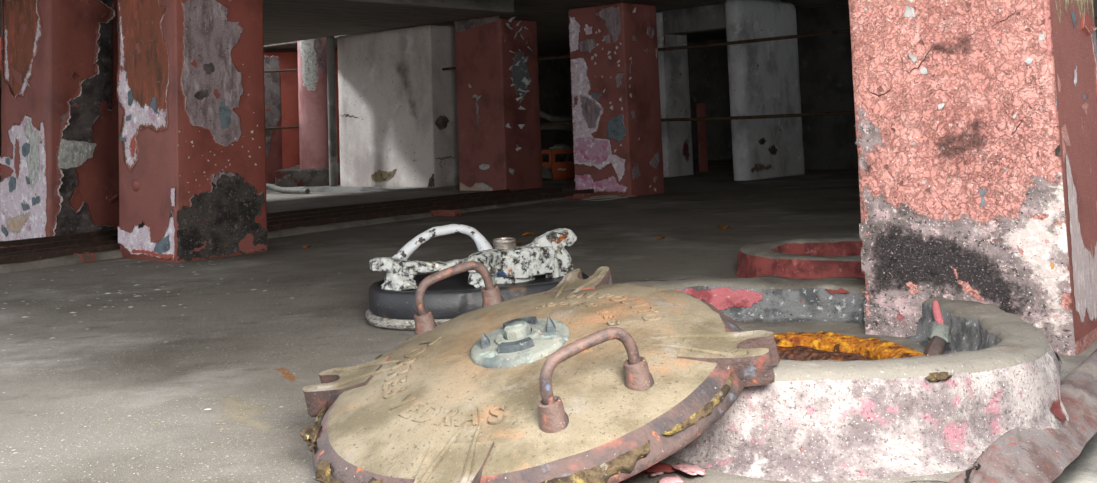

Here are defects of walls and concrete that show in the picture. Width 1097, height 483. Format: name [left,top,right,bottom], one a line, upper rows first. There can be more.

peeling [0,0,282,262]
peeling [568,5,668,194]
peeling [856,105,885,170]
peeling [1051,0,1097,100]
peeling [825,145,1097,356]
damp [870,182,1071,337]